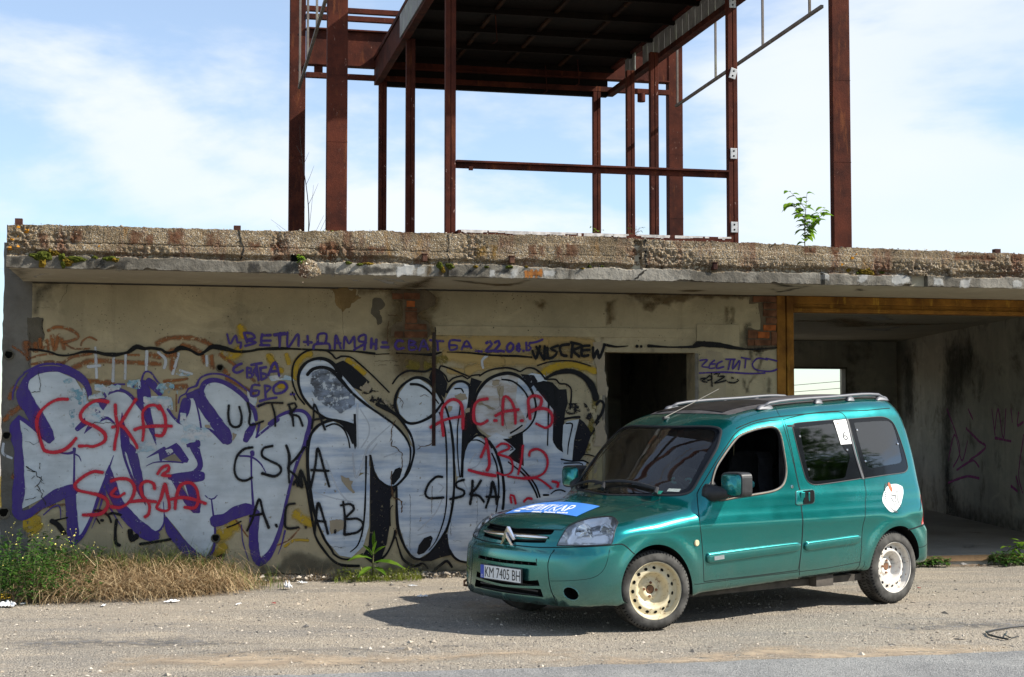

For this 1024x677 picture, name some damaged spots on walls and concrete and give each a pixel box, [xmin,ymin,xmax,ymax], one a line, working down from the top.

crack [236,230,244,260]
spalling [330,287,436,342]
damp [326,258,519,372]
spalling [746,295,777,352]
damp [944,348,997,526]